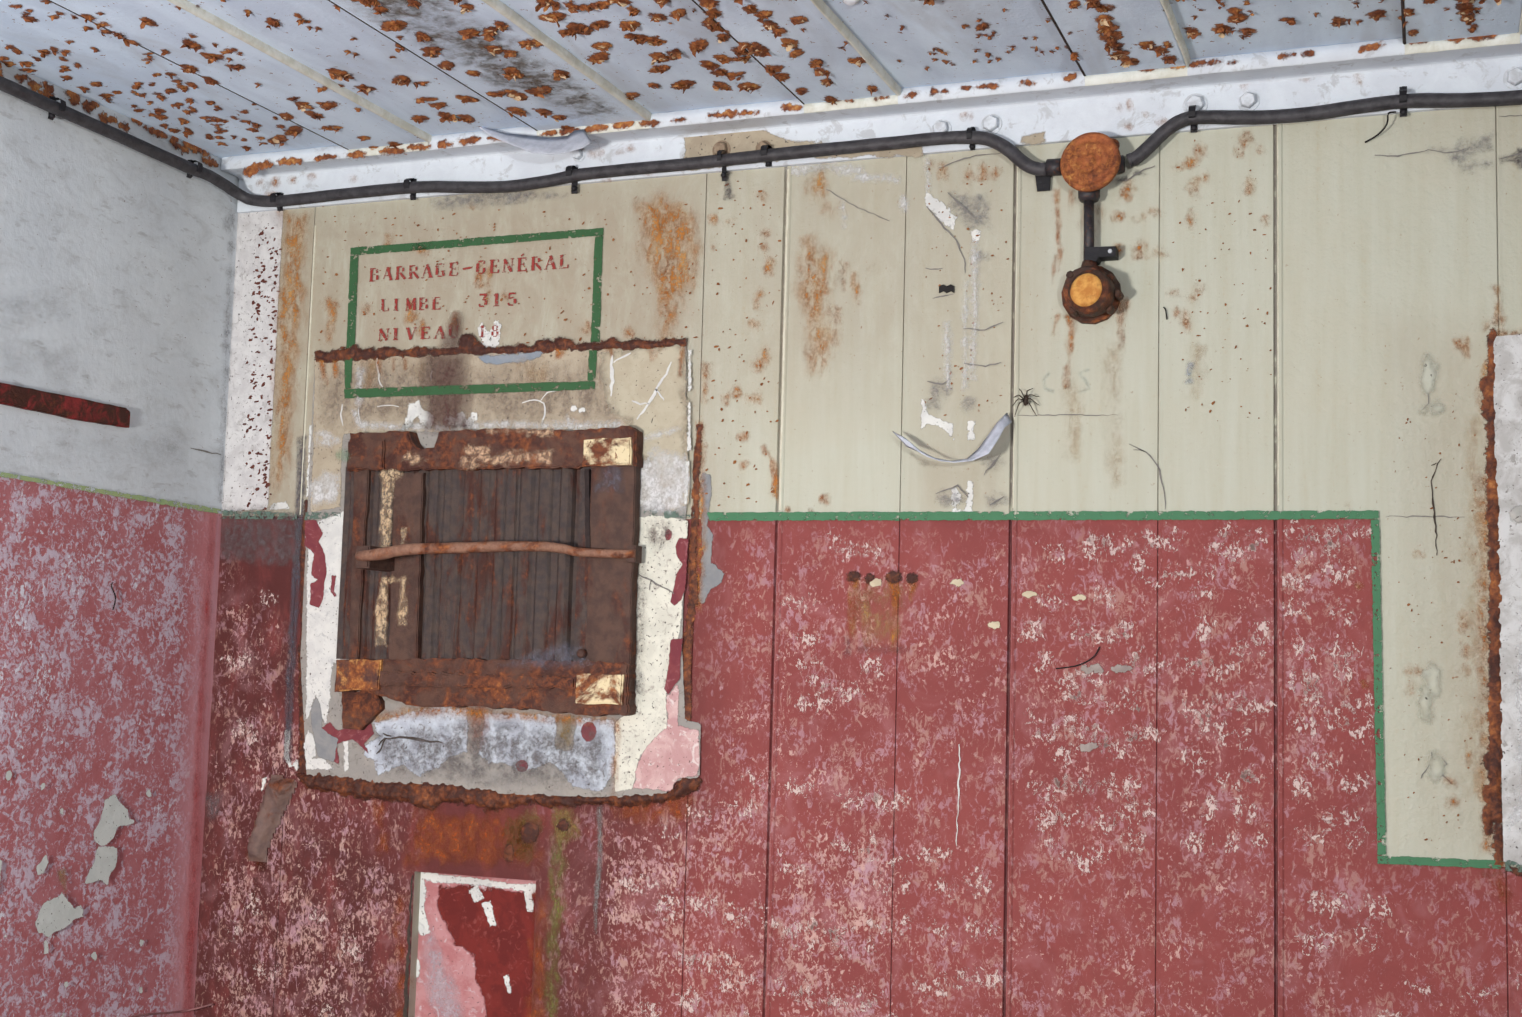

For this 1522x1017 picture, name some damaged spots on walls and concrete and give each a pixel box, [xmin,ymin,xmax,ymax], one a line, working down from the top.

rust [0,0,686,196]
rust [1277,50,1315,60]
rust [615,200,699,338]
rust [277,218,303,477]
peeling [268,501,289,510]
rust [697,329,789,604]
peeling [304,320,724,792]
rust [847,570,918,642]
spalling [36,855,49,875]
spalling [35,893,83,954]
spalling [85,794,134,885]
peeling [418,872,536,936]